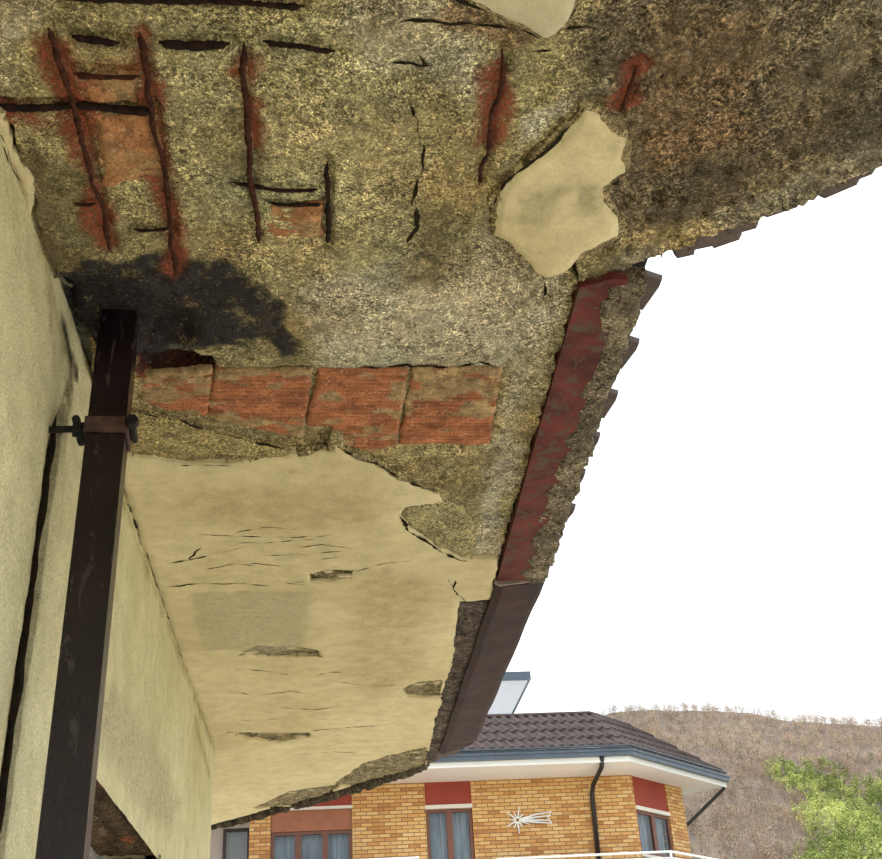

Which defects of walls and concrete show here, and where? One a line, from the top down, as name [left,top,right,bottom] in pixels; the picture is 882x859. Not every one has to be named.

corrosion [35,34,118,249]
damp [29,157,299,382]
corrosion [143,169,190,277]
crack [407,103,426,243]
spalling [0,0,882,564]
corrosion [476,60,516,151]
crack [124,490,194,619]
crack [174,527,352,586]
crack [359,517,470,600]